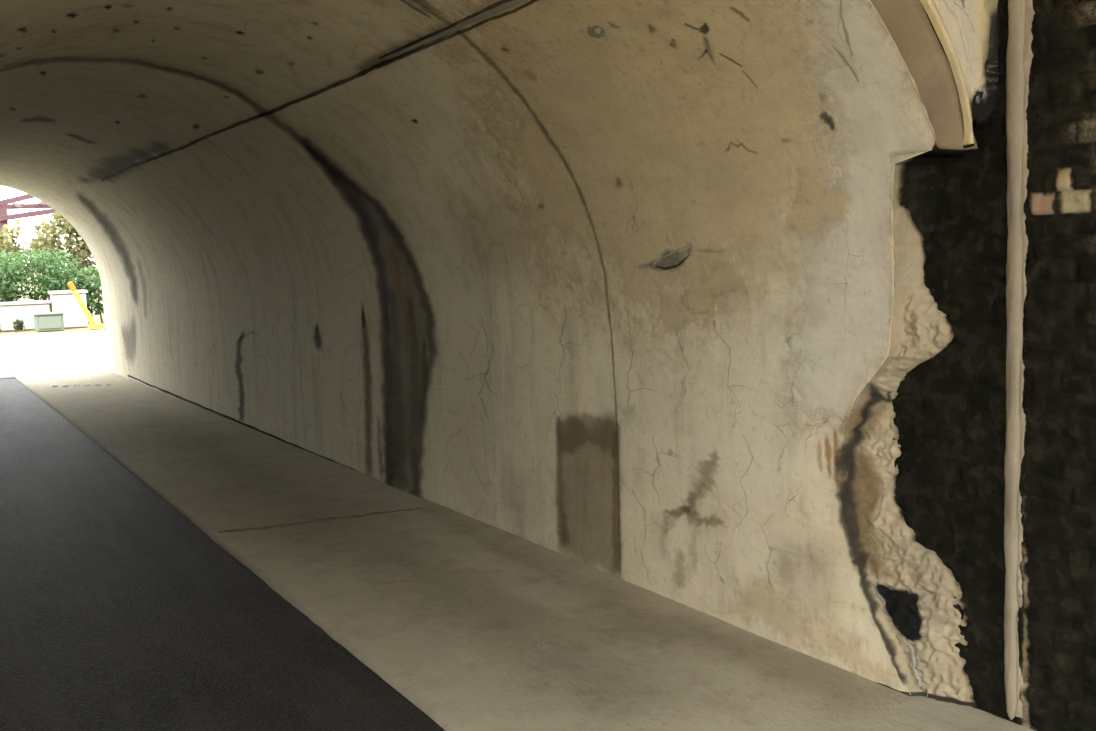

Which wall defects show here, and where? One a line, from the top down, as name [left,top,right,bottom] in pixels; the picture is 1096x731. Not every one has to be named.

crack [0,0,613,491]
water stain [362,306,371,472]
water stain [557,424,567,541]
crack [613,383,621,548]
peeling [438,0,974,706]
crack [835,385,905,682]
water stain [892,0,1096,731]